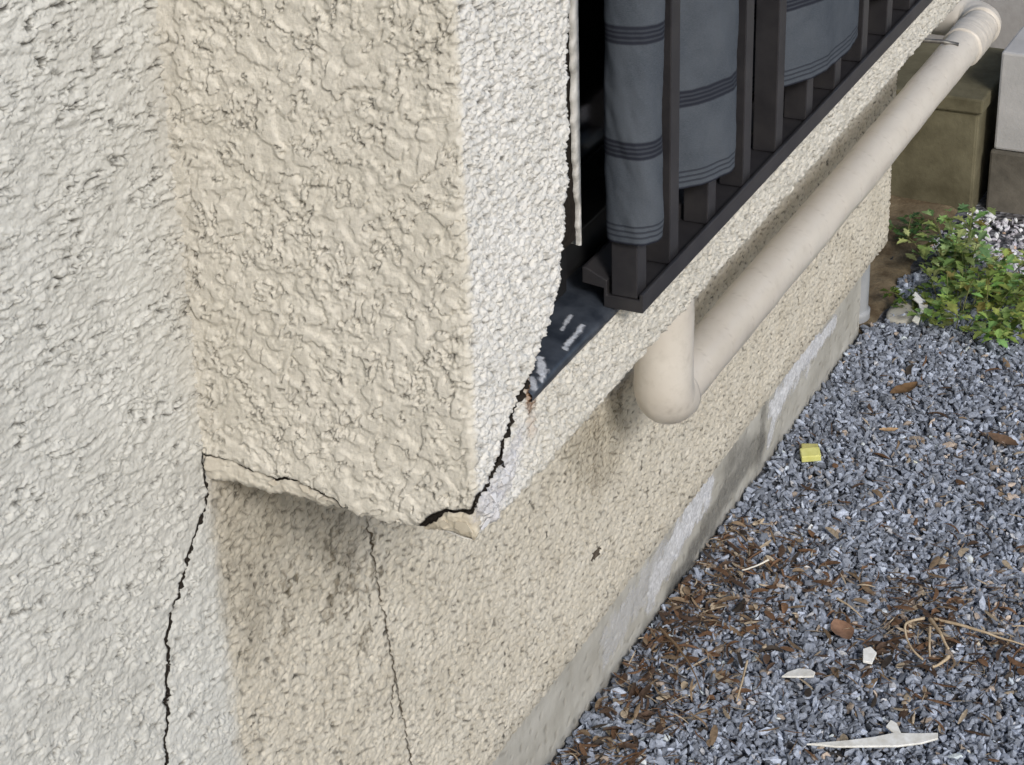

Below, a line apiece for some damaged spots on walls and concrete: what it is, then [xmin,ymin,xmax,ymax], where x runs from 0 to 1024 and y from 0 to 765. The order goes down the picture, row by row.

crack [419,374,531,527]
crack [163,454,412,765]